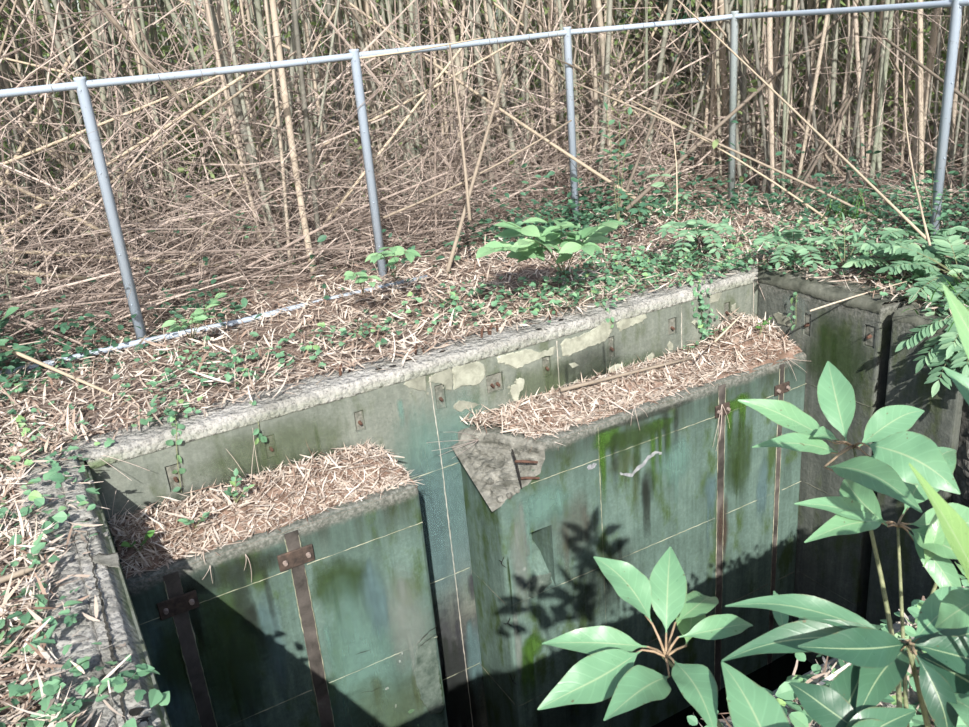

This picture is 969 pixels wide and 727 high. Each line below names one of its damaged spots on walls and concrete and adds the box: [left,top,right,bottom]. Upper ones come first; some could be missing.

spalling [16,258,969,727]